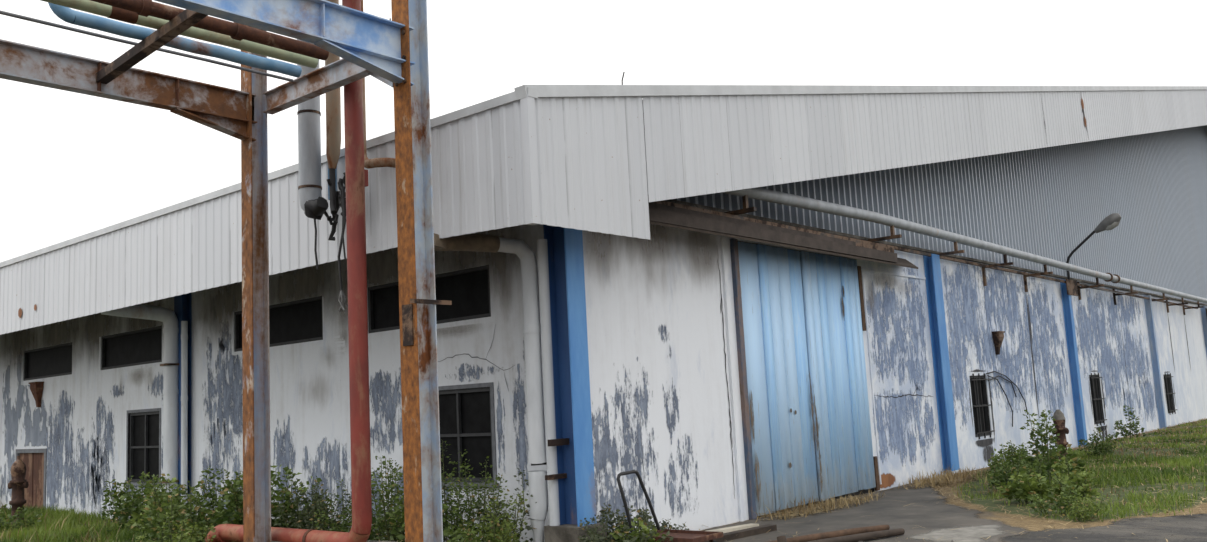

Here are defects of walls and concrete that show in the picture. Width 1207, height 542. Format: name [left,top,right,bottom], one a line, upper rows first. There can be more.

peeling [0,358,124,515]
peeling [202,323,243,509]
peeling [273,417,352,514]
peeling [369,369,403,454]
crack [438,324,513,391]
peeling [592,357,698,533]
peeling [866,267,936,465]
peeling [943,256,1157,425]